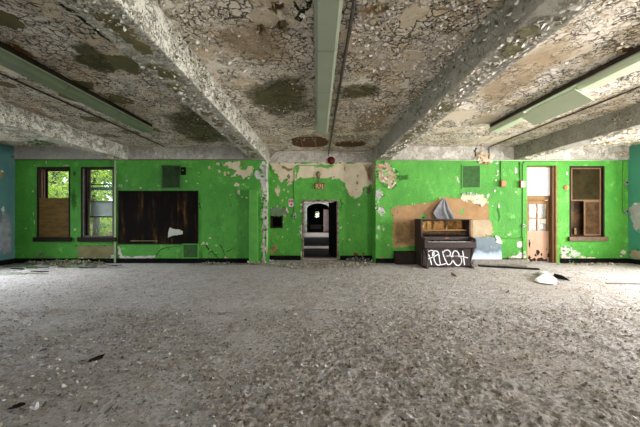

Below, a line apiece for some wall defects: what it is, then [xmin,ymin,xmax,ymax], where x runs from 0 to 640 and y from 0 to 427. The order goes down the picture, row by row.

crack [59,4,110,42]
crack [293,0,312,22]
leakage [71,43,114,70]
leakage [248,78,308,116]
leakage [342,85,378,98]
leakage [166,108,228,143]
peeling [0,0,640,263]